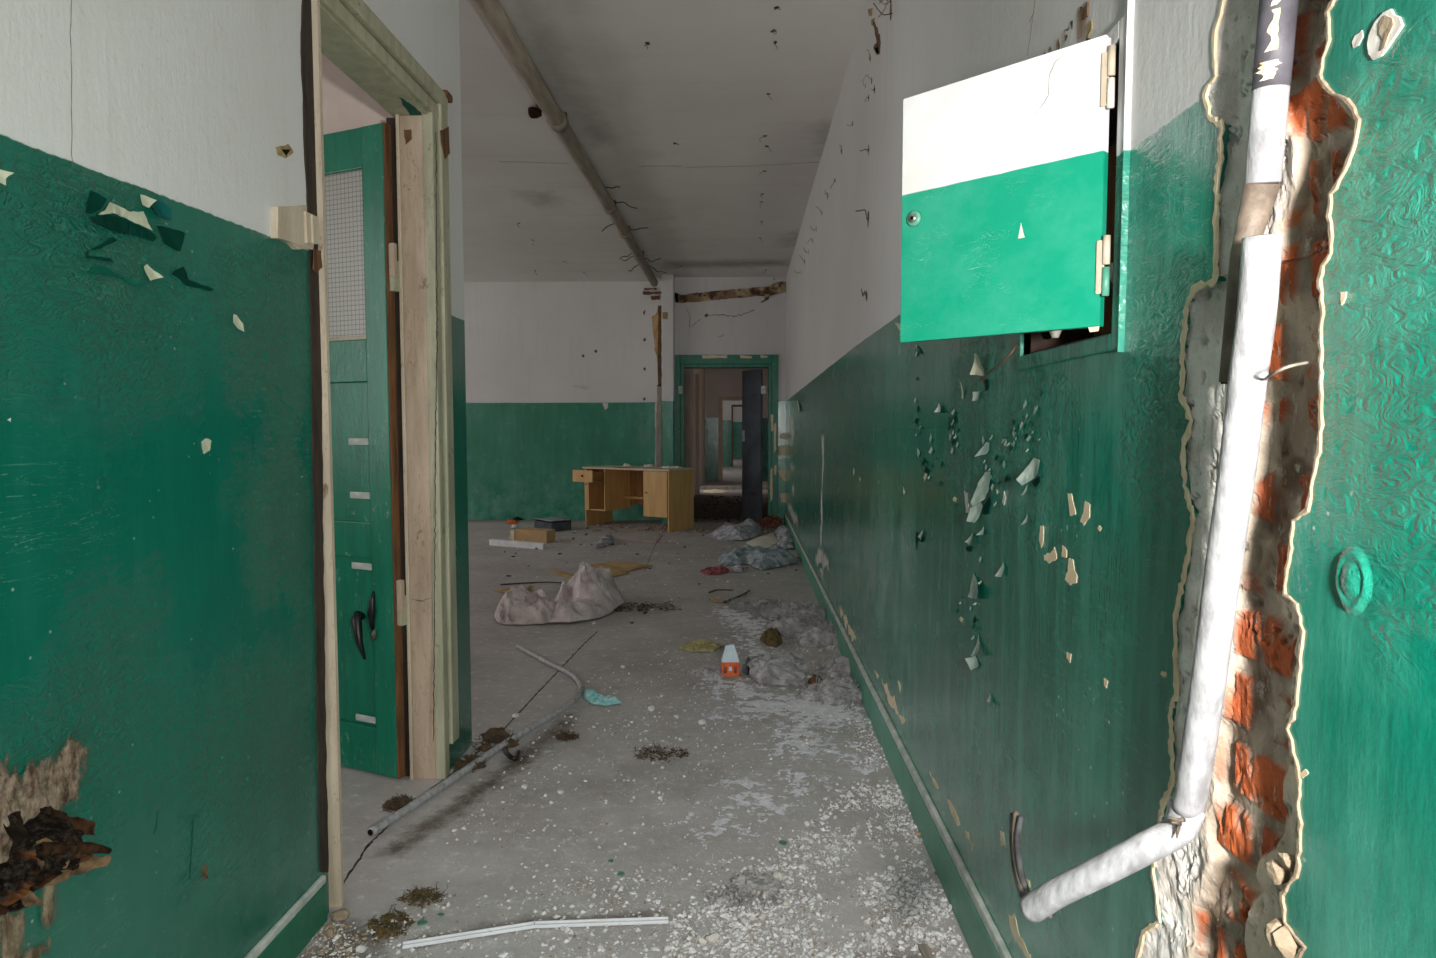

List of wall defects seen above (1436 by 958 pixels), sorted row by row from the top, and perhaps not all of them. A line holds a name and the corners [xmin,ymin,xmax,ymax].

flaking render [1352,9,1404,60]
peeling [0,169,13,186]
peeling [85,190,213,291]
peeling [914,353,1044,670]
peeling [1068,493,1101,531]
flaking render [1135,0,1361,958]
peeling [1020,513,1077,586]
peeling [875,671,905,724]
spalling [0,806,93,916]
peeling [1009,914,1031,958]